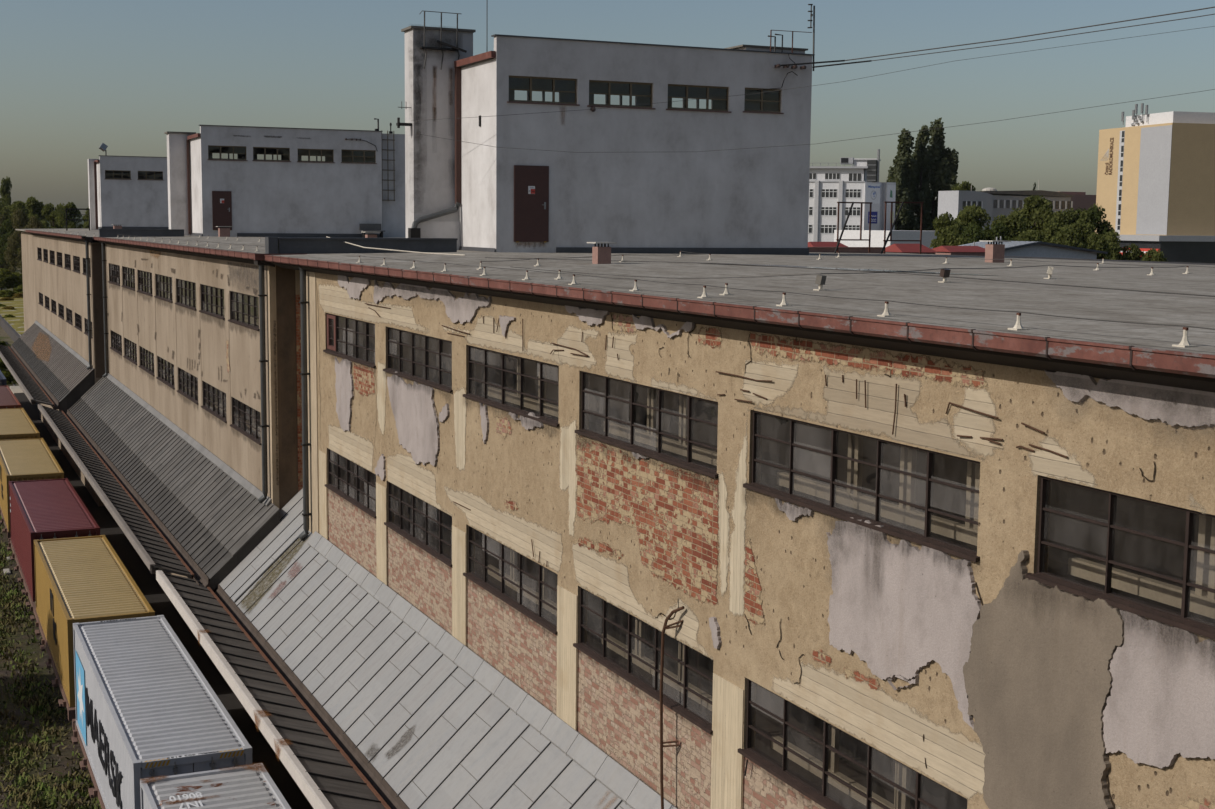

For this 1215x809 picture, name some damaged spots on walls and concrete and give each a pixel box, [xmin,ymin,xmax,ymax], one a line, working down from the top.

spalling [318,275,722,401]
spalling [328,357,765,656]
spalling [1029,437,1095,487]
peeling [1044,370,1215,427]
peeling [771,517,986,799]
peeling [1102,610,1215,768]